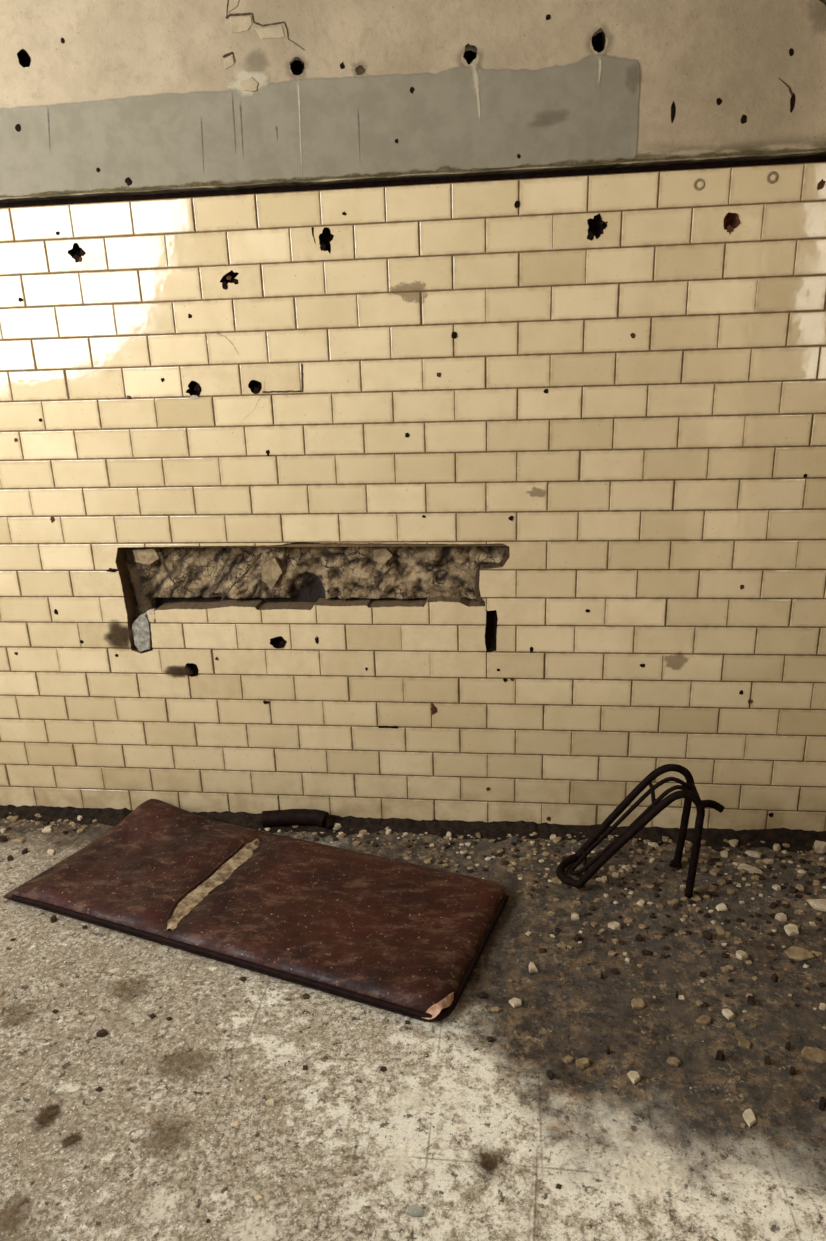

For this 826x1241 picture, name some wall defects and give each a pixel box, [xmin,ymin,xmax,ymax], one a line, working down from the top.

crack [223,0,304,69]
flaking render [228,70,268,97]
spalling [107,542,510,652]